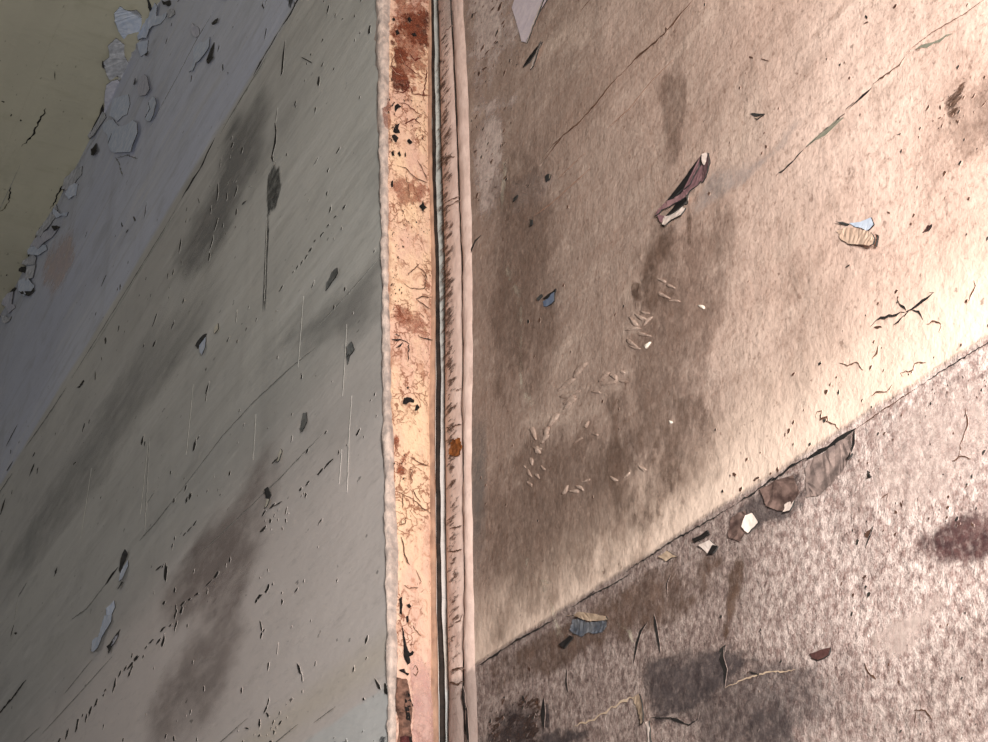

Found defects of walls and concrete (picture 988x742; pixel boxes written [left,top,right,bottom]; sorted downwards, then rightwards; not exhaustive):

rust [390,0,429,93]
flaking render [467,0,547,90]
leakage [942,82,965,117]
peeling [1,0,179,323]
crack [22,0,298,448]
leakage [263,166,281,306]
rust [393,174,429,205]
rust [395,305,430,335]
spalling [753,434,879,512]
leakage [920,513,988,561]
spalling [374,597,414,742]
leakage [644,651,743,721]